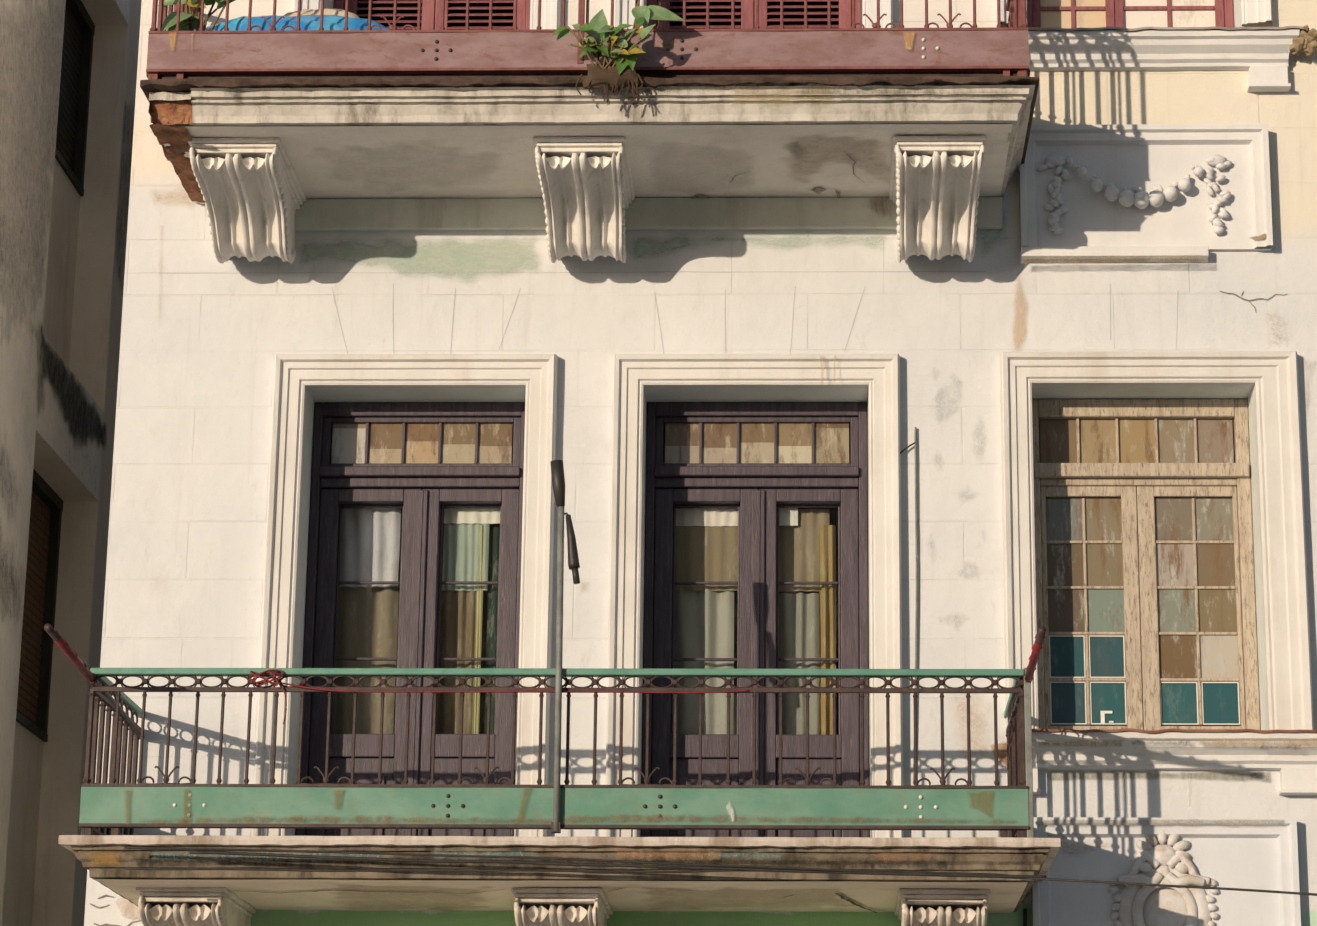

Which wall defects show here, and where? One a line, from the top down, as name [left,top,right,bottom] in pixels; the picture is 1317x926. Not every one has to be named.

spalling [148,92,206,203]
leakage [117,103,134,288]
peeling [304,241,534,277]
leakage [1015,289,1025,346]
crack [1220,291,1286,311]
leakage [37,331,106,447]
leakage [141,857,944,869]